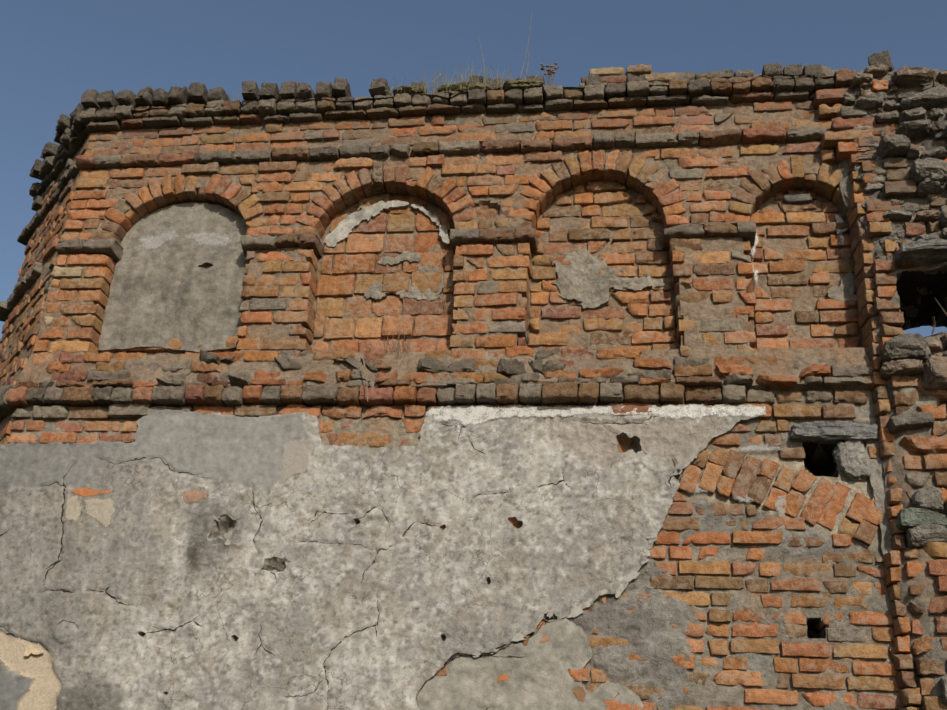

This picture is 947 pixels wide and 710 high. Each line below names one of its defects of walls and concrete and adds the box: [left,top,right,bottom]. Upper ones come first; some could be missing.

hole [612,433,648,458]
spalling [65,487,115,527]
crack [43,457,212,605]
hole [208,511,240,546]
crack [252,490,270,543]
hole [253,556,291,574]
peeling [567,532,658,618]
crack [143,616,200,634]
crack [285,507,439,710]
peeling [0,631,63,710]
crack [416,619,545,702]
spalling [572,686,587,702]